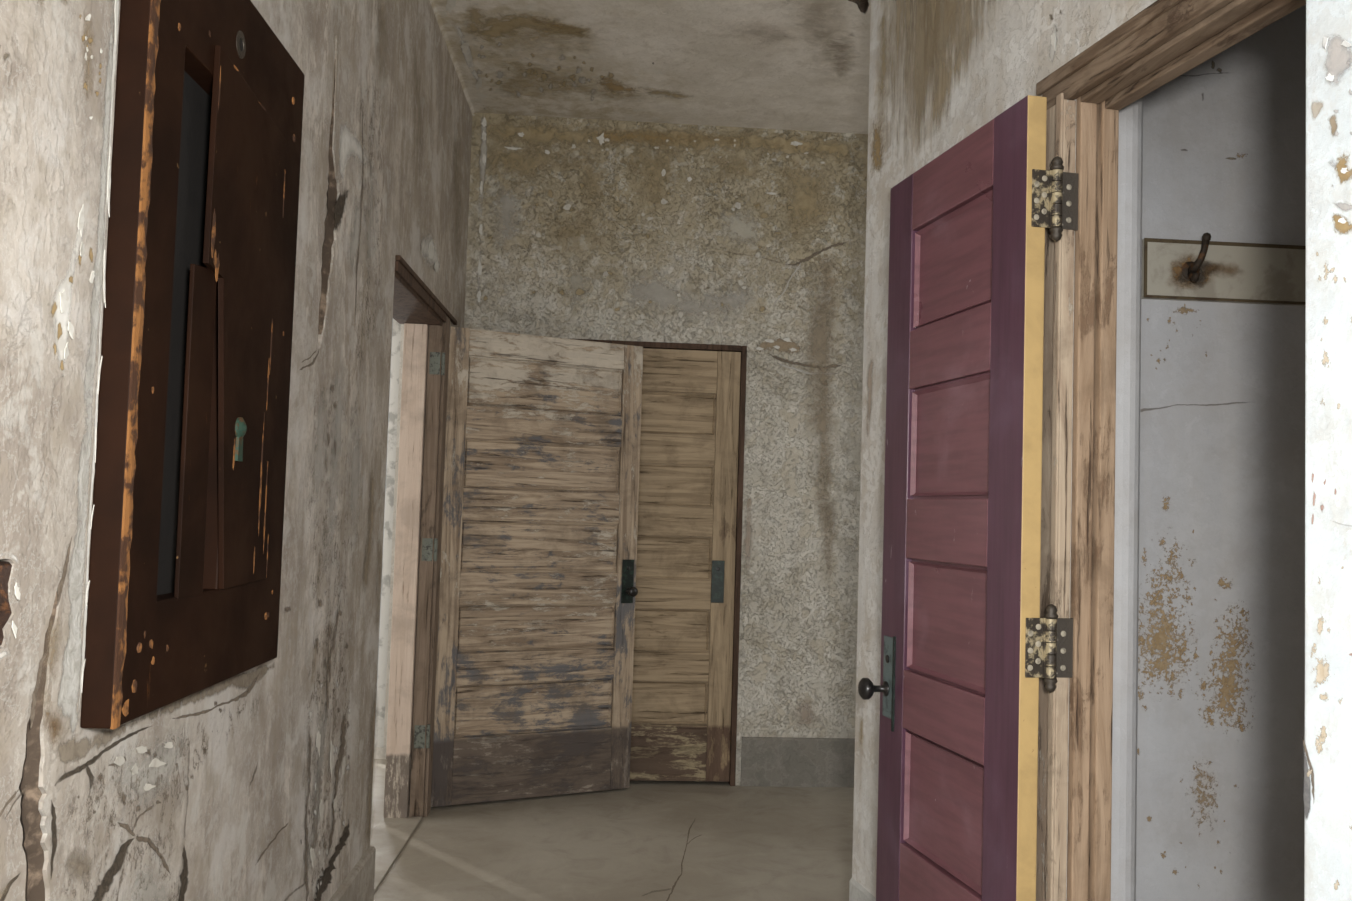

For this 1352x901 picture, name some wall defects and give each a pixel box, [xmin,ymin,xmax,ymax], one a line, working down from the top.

leakage [468,8,635,101]
leakage [881,0,971,126]
crack [300,59,364,370]
leakage [485,122,849,228]
leakage [872,127,883,170]
peeling [1331,154,1352,186]
peeling [1332,203,1352,234]
peeling [51,204,106,370]
crack [773,242,844,306]
spalling [0,554,21,658]
crack [0,538,188,901]
crack [258,824,287,862]